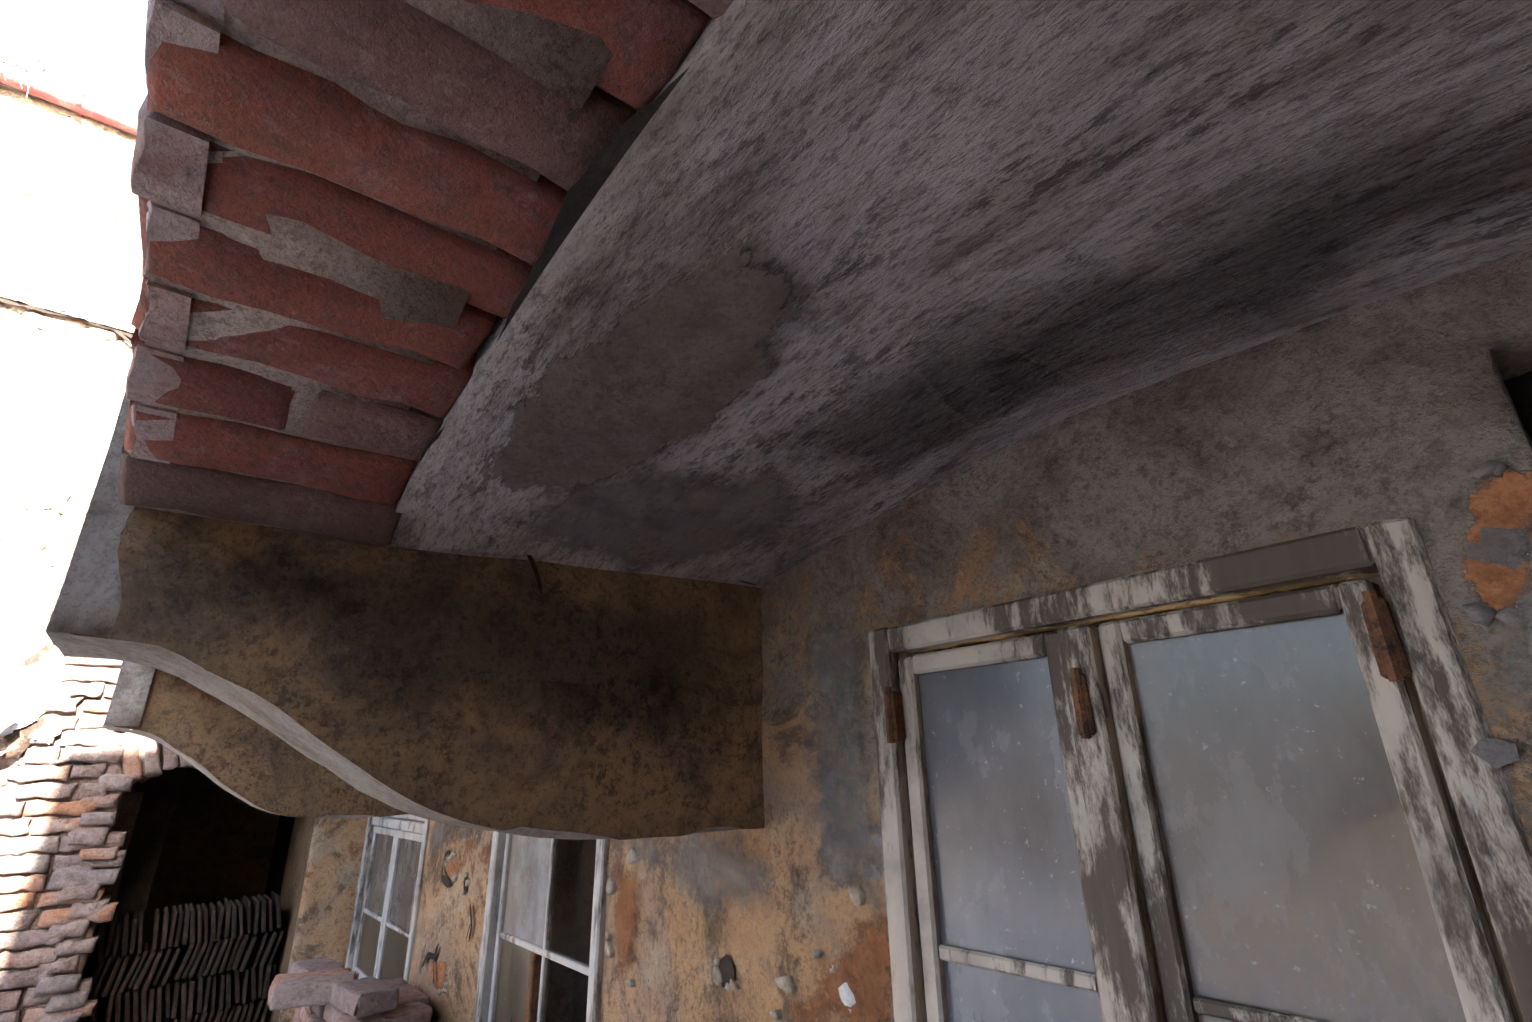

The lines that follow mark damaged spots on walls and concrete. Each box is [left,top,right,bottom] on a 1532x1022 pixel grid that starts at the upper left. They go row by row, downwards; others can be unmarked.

crack [0,297,133,344]
flaking render [0,322,130,515]
spalling [1462,460,1532,721]
spalling [712,954,740,991]
flaking render [830,965,856,1013]